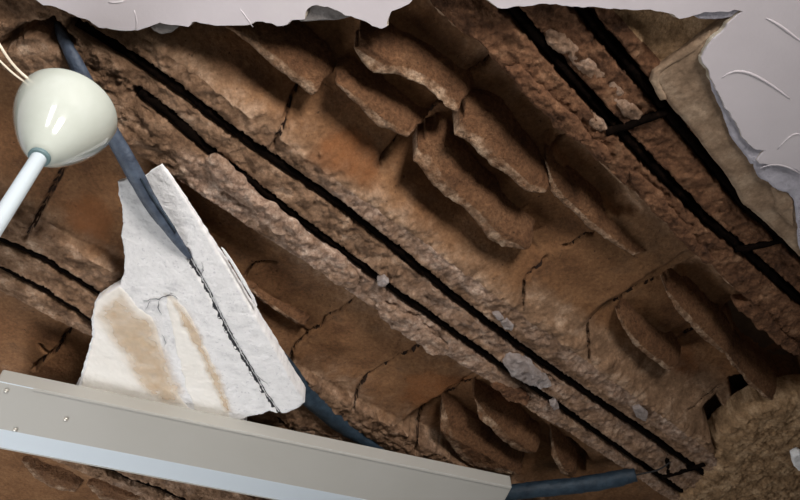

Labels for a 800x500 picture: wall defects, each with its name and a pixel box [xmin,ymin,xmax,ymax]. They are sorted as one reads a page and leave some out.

crack [27,168,64,234]
spalling [0,0,655,484]
crack [613,277,653,301]
leakage [106,303,173,399]
leakage [182,315,206,357]
crack [289,312,331,359]
crack [353,344,420,408]
spalling [0,449,271,500]